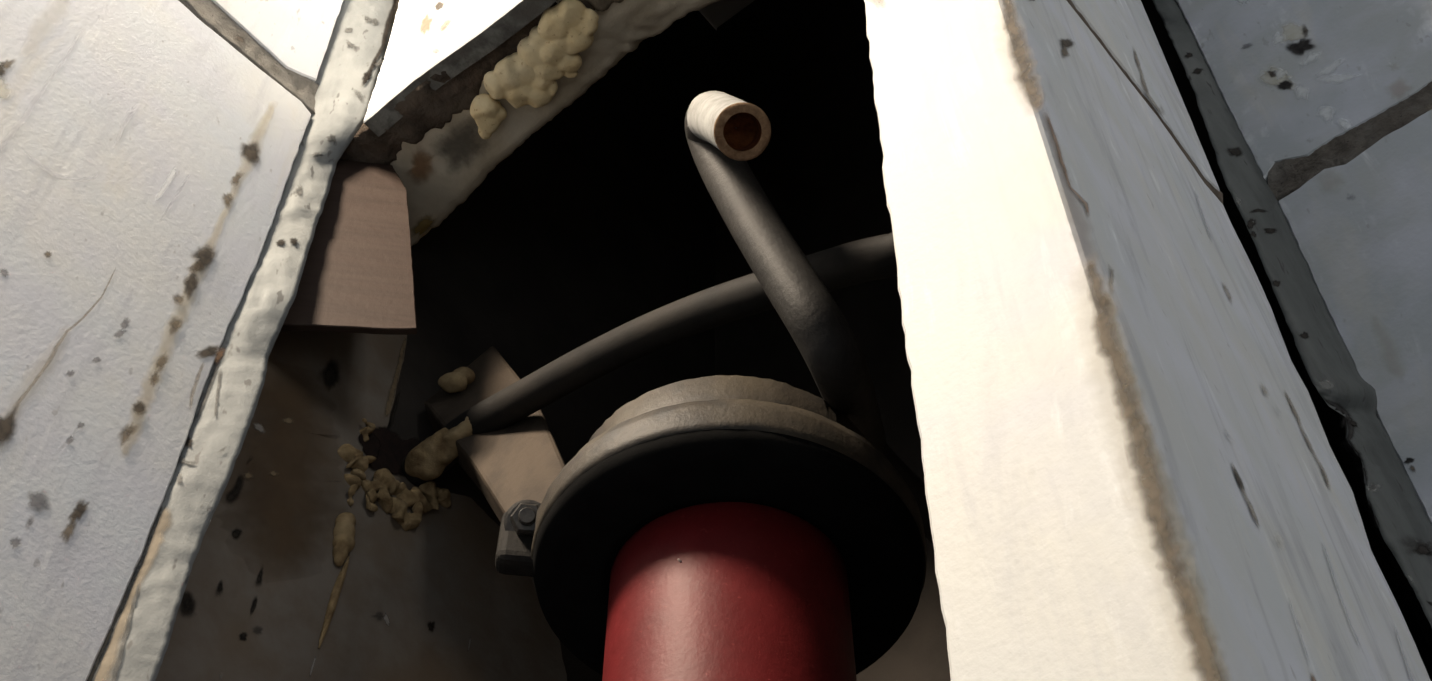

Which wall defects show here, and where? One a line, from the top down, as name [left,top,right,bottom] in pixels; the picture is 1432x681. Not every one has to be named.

leakage [1004,0,1043,109]
corrosion [223,143,259,205]
corrosion [170,246,215,333]
corrosion [151,356,167,384]
corrosion [120,401,145,443]
leakage [1087,263,1222,681]